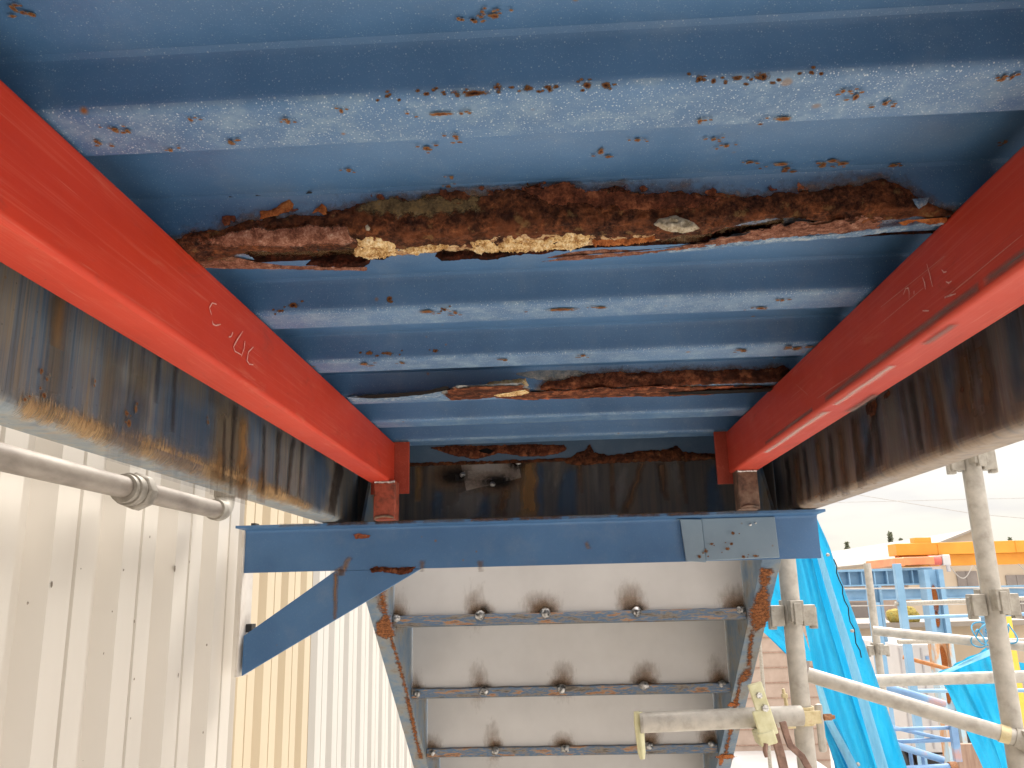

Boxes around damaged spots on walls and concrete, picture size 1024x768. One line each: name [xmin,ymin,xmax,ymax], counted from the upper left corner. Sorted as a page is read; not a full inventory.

rust [415,83,559,97]
rust [576,78,617,92]
rust [687,72,782,86]
rust [174,161,953,264]
peeling [435,218,850,261]
rust [537,365,789,391]
damp [165,394,247,487]
rust [410,444,716,521]
rust [370,563,423,575]
rust [728,554,774,708]
rust [376,591,423,759]
rust [715,729,735,766]